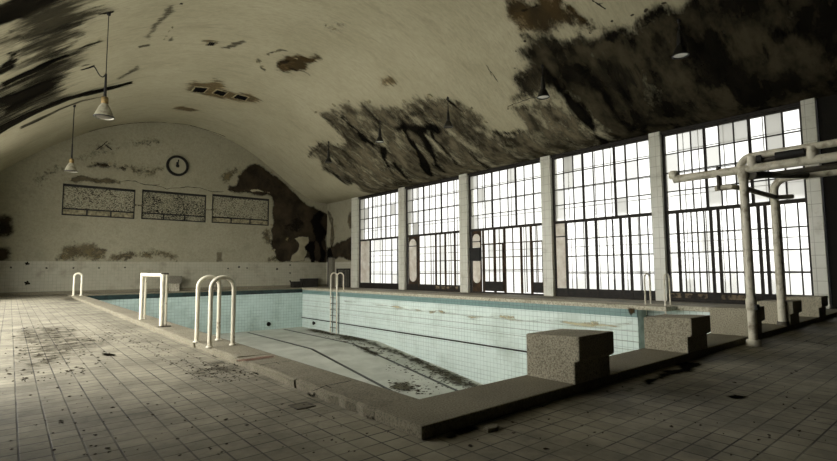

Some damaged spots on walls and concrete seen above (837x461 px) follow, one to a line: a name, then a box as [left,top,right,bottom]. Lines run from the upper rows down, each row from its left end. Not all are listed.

water stain [0,0,138,134]
water stain [512,0,837,145]
water stain [56,243,176,262]
flaking render [227,163,351,263]